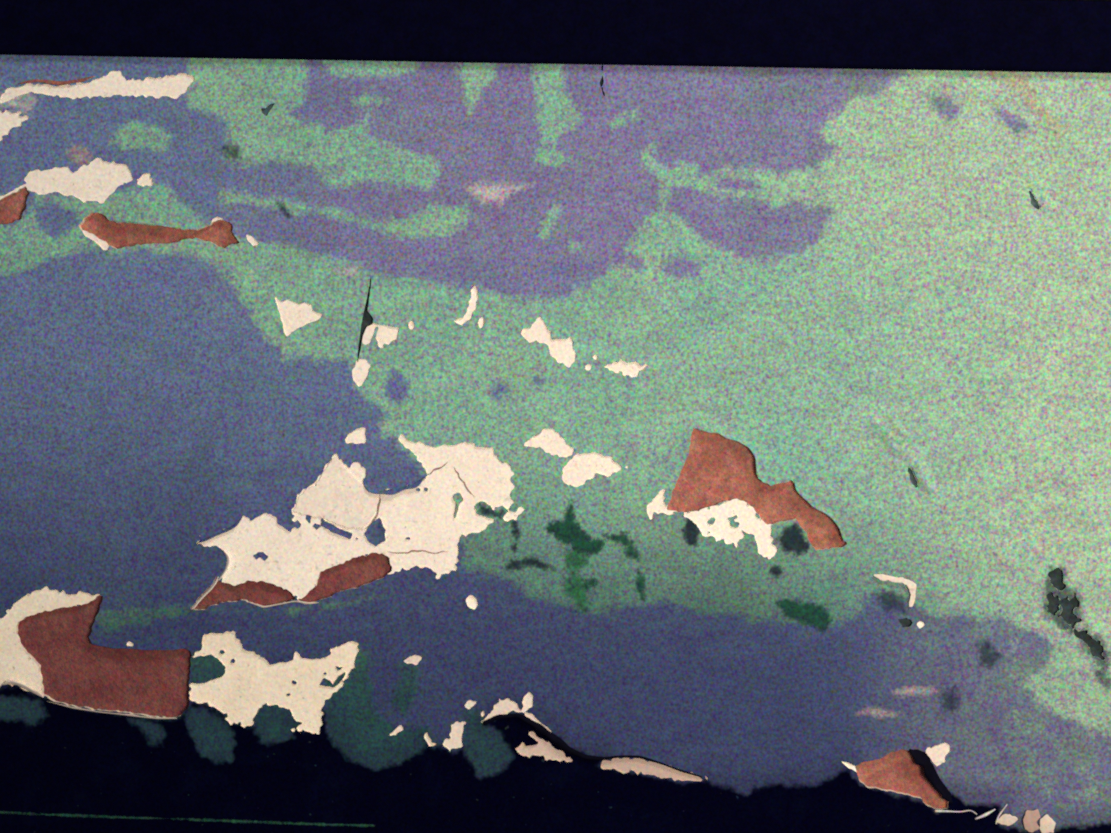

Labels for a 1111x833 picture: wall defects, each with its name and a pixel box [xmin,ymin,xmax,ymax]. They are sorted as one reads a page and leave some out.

peeling [0,70,195,141]
spalling [0,158,259,250]
crack [358,282,373,360]
peeling [521,317,648,377]
peeling [190,434,525,610]
peeling [524,429,628,487]
spalling [647,427,847,559]
spalling [0,586,360,734]
peeling [424,692,573,762]
peeling [601,758,708,781]
spalling [842,743,953,808]
peeling [998,809,1056,833]